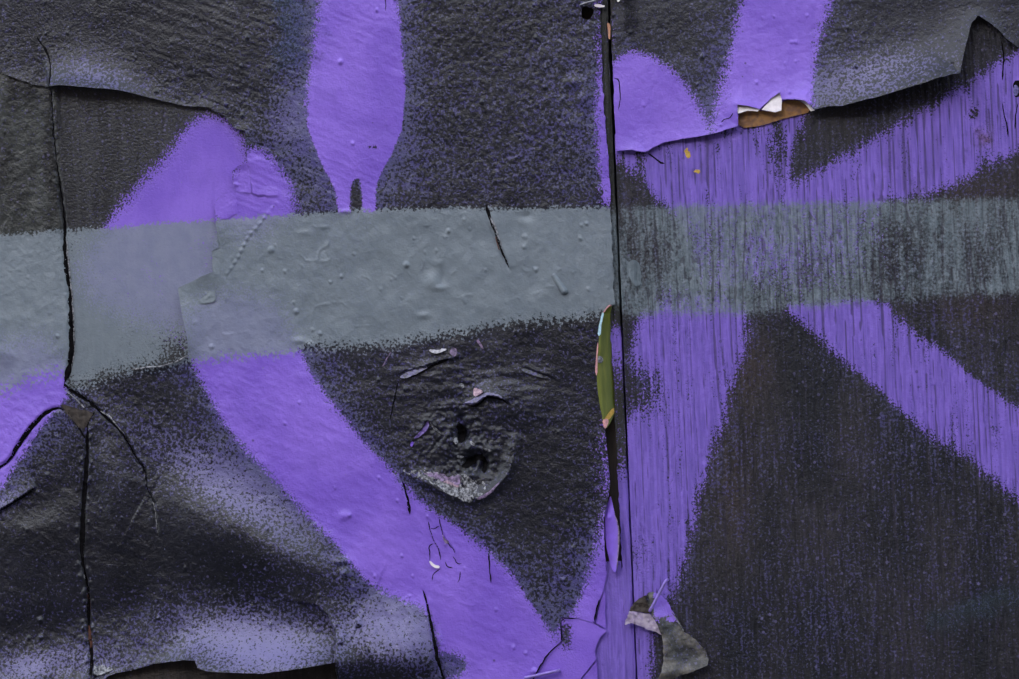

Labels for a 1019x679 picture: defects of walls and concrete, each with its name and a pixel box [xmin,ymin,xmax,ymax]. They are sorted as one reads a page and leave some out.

peeling [0,70,251,388]
crack [485,205,509,267]
crack [0,37,158,676]
peeling [390,347,457,419]
peeling [459,383,508,407]
peeling [534,16,1019,679]
spalling [403,421,500,502]
peeling [89,660,338,679]